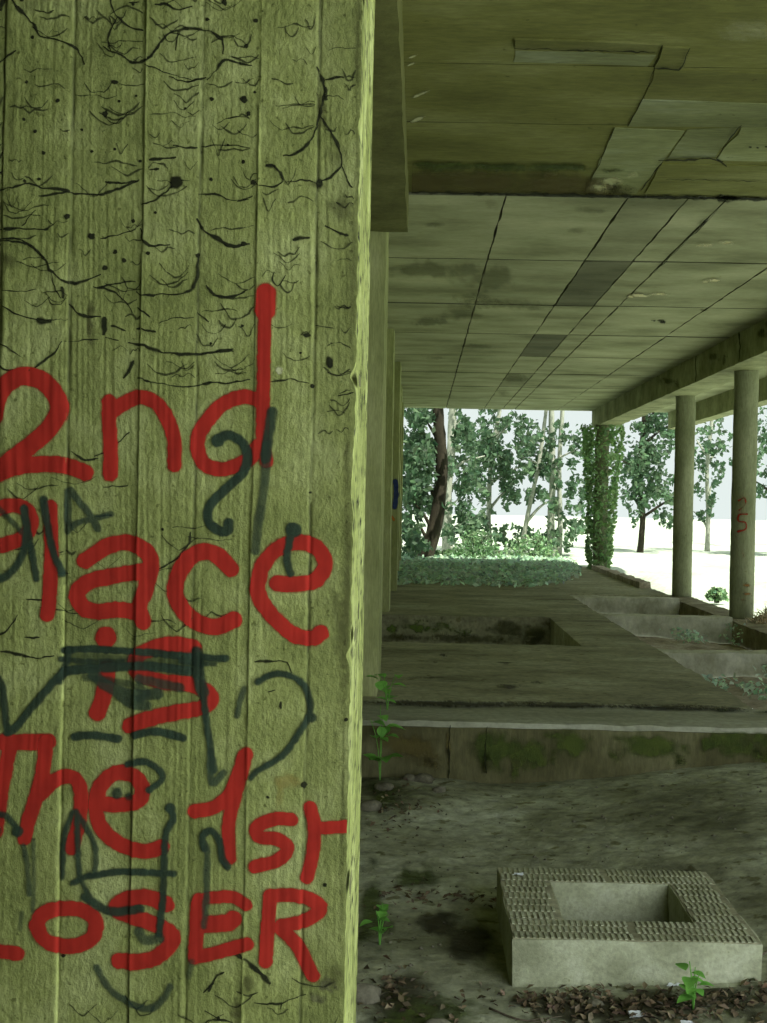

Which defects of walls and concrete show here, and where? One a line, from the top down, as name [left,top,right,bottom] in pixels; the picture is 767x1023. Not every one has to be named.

peeling [594,175,632,191]
crack [0,0,356,434]
crack [7,432,130,499]
crack [59,523,120,574]
crack [126,525,232,637]
crack [0,599,99,659]
crack [254,660,292,673]
crack [69,995,152,1023]
crack [178,954,334,1023]